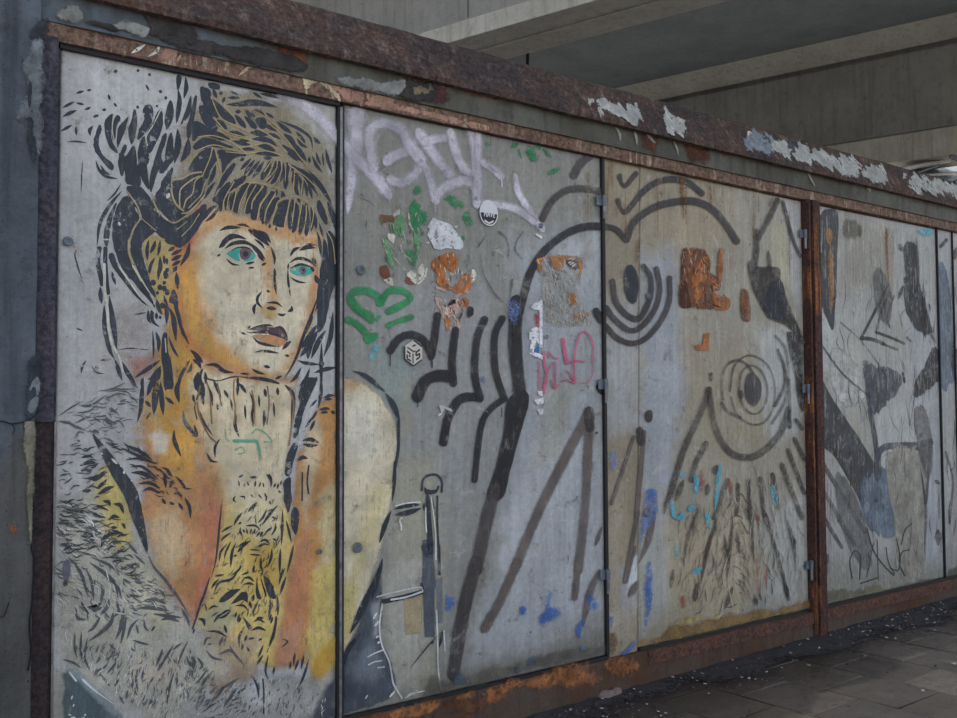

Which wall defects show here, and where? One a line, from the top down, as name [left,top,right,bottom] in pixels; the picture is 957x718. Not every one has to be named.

spalling [16,5,490,162]
peeling [588,97,644,126]
peeling [663,106,687,138]
peeling [743,127,889,185]
peeling [903,171,957,199]
leakage [638,601,810,645]
rust [376,662,594,718]